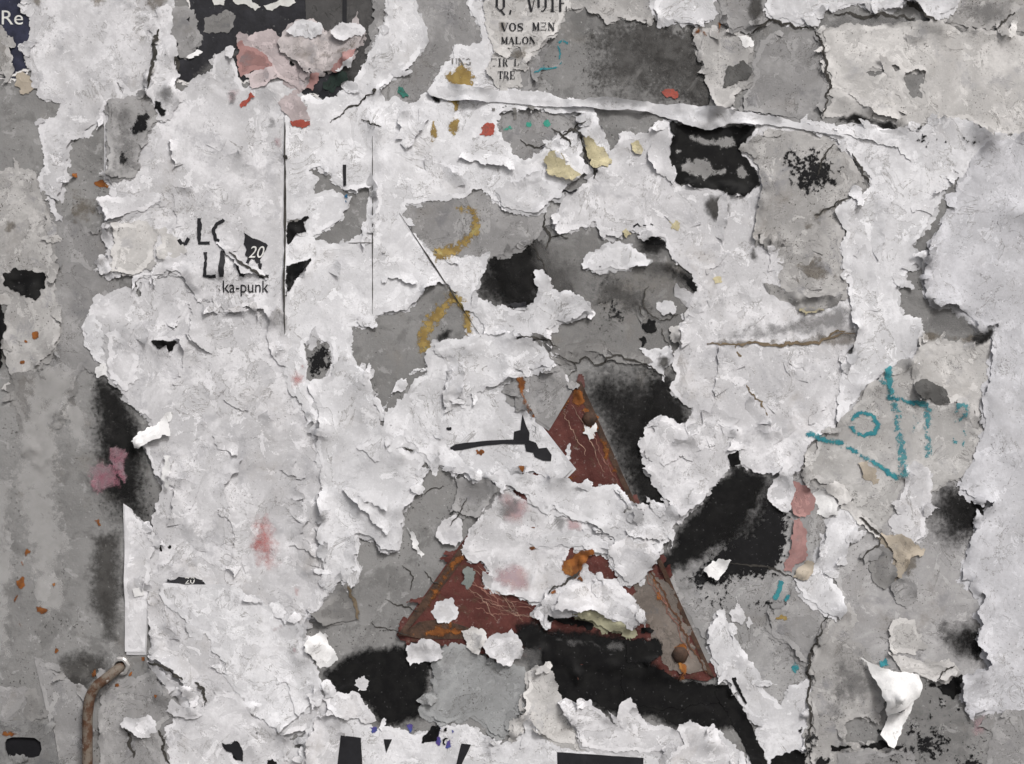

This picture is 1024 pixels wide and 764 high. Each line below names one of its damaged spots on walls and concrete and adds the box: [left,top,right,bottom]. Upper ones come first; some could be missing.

crack [750,0,937,114]
crack [330,88,381,314]
crack [399,213,479,334]
rust [517,377,535,417]
peeling [439,550,458,563]
rust [562,549,594,582]
crack [730,563,792,577]
rust [426,622,462,637]
crack [805,615,829,751]